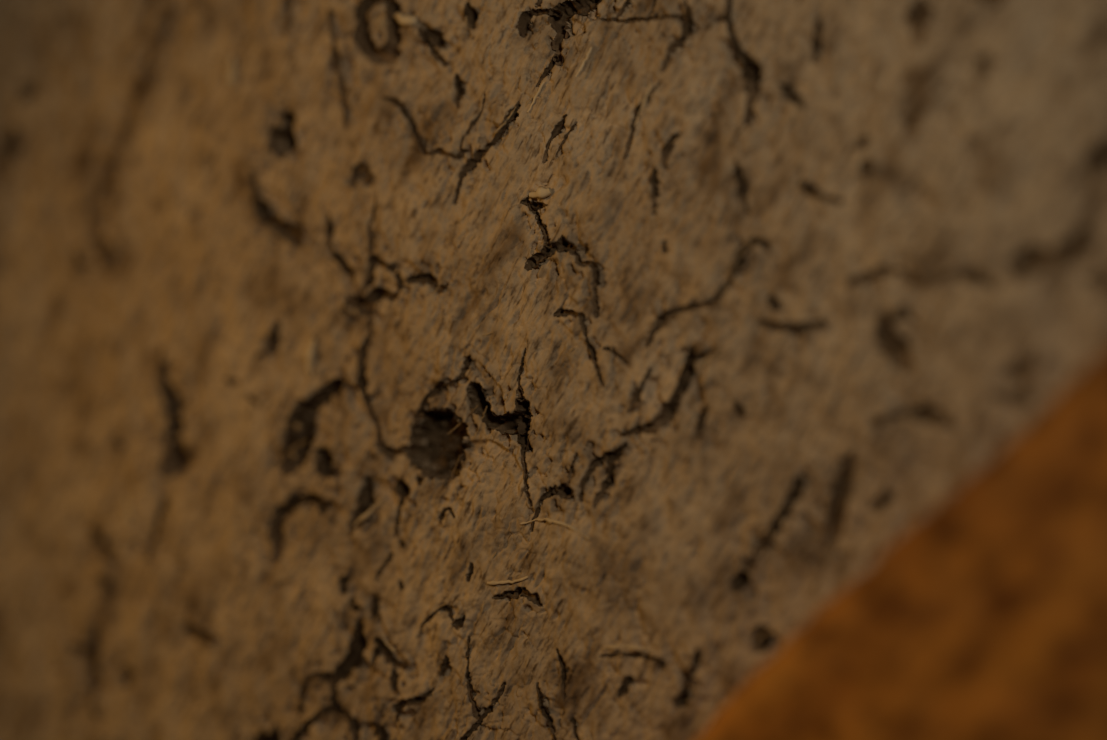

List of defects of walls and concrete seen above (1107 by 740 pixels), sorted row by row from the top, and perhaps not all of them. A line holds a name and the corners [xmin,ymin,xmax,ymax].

crack [249,169,304,248]
crack [382,93,521,204]
crack [520,0,770,388]
crack [341,191,449,458]
crack [459,347,716,532]
crack [438,507,455,525]
crack [465,563,474,582]
crack [492,587,543,607]
crack [255,619,435,740]
crack [460,636,506,740]
crack [536,649,567,740]
crack [600,650,702,708]